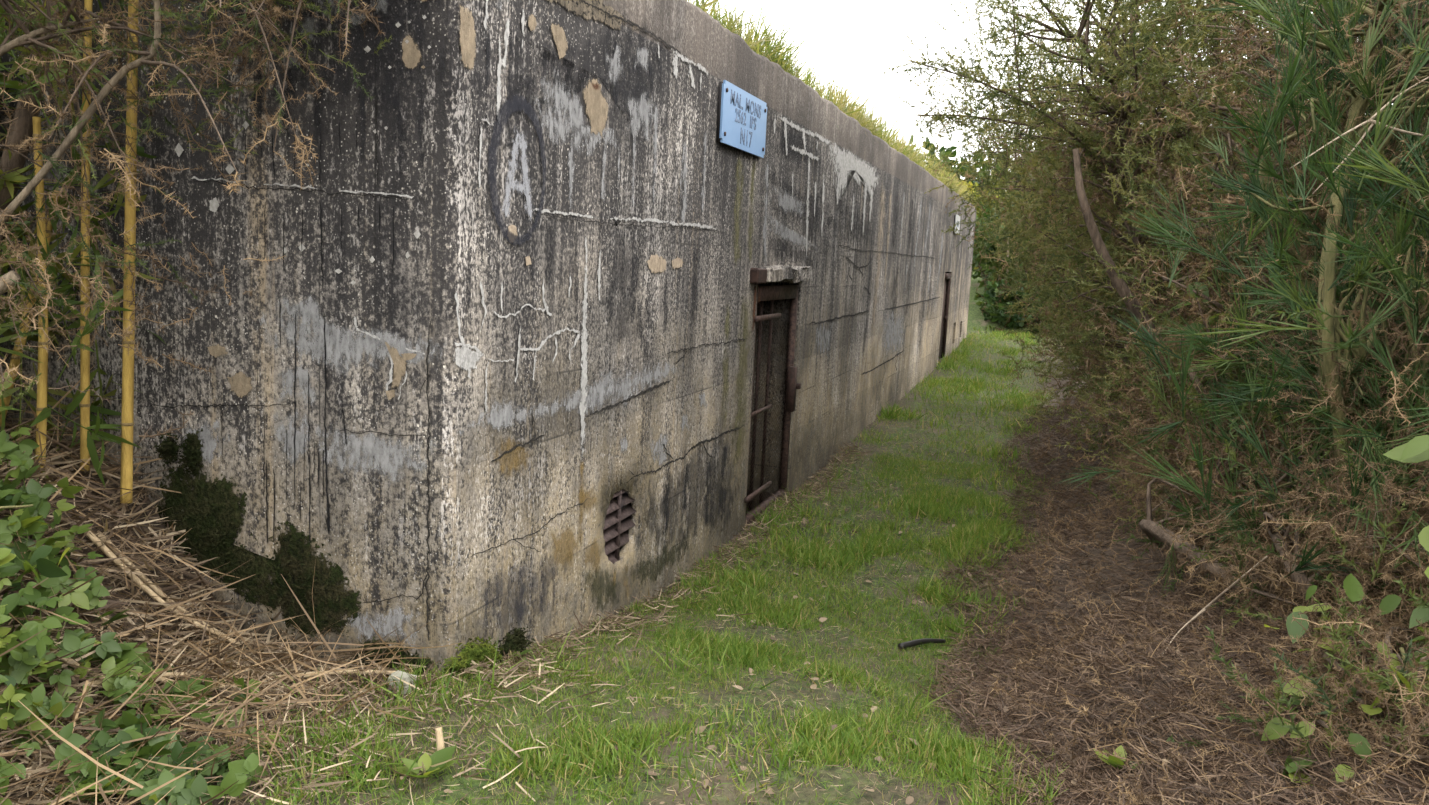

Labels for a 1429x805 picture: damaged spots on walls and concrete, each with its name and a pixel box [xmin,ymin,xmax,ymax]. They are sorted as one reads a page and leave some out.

spalling [402,35,425,69]
spalling [459,5,476,69]
efflorescence [478,0,530,187]
spalling [528,0,637,59]
spalling [584,79,608,136]
efflorescence [606,44,708,91]
efflorescence [537,74,658,208]
peeling [647,254,684,273]
leakage [261,203,676,543]
crack [587,338,745,417]
leakage [185,421,230,463]
crack [627,425,745,483]